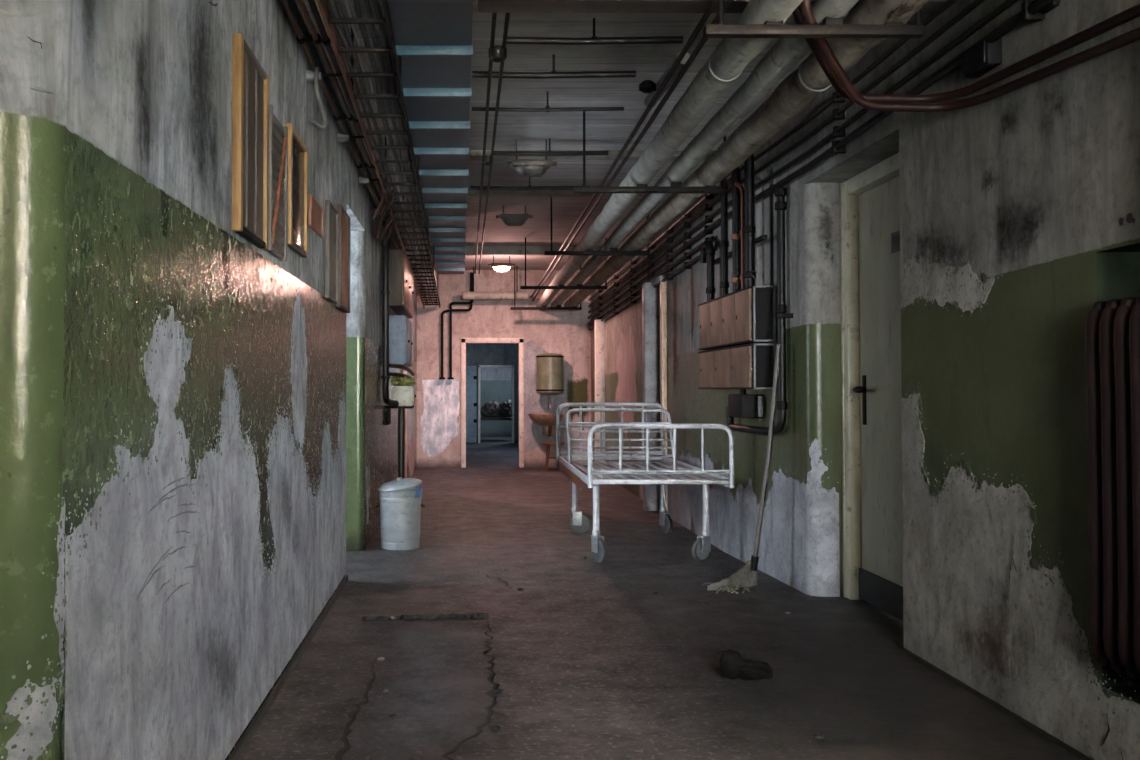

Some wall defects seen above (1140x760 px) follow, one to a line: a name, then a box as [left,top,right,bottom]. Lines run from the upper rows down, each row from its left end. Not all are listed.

leakage [138,40,149,151]
leakage [190,20,211,171]
peeling [900,240,1002,317]
peeling [614,324,644,501]
peeling [0,293,346,760]
peeling [659,438,840,597]
peeling [901,387,1140,760]
crack [334,663,376,760]
crack [441,622,509,760]